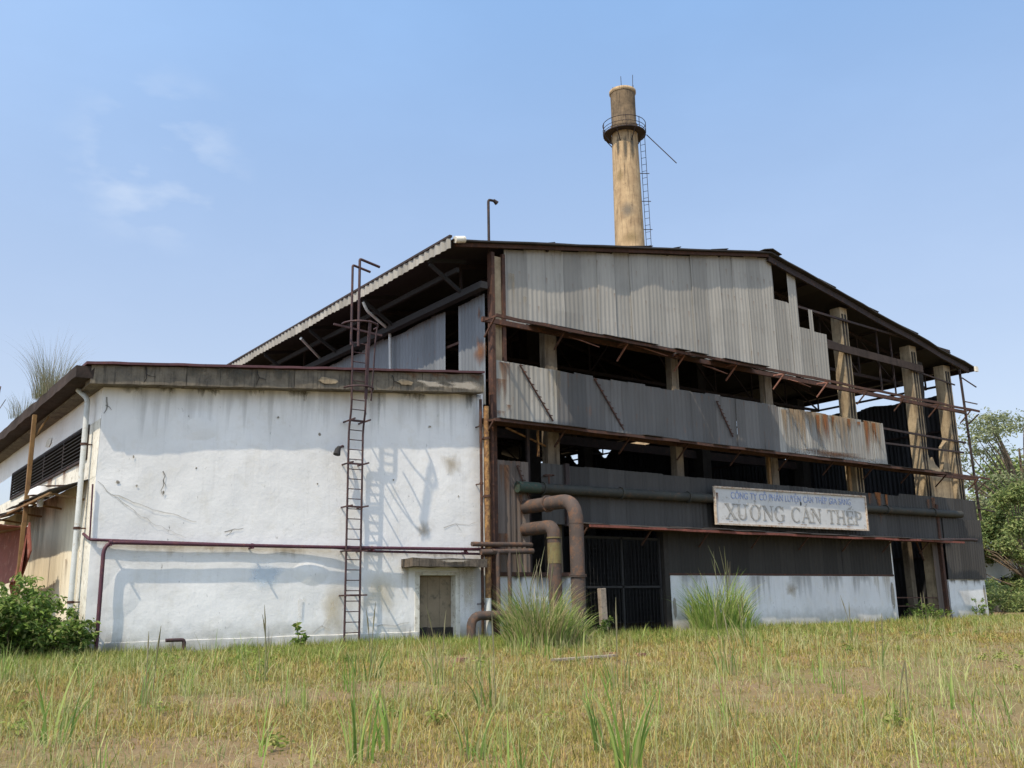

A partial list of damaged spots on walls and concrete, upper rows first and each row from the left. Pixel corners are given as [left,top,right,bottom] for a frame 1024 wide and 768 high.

spalling [397,379,478,390]
rust [781,408,880,445]
crack [98,471,196,537]